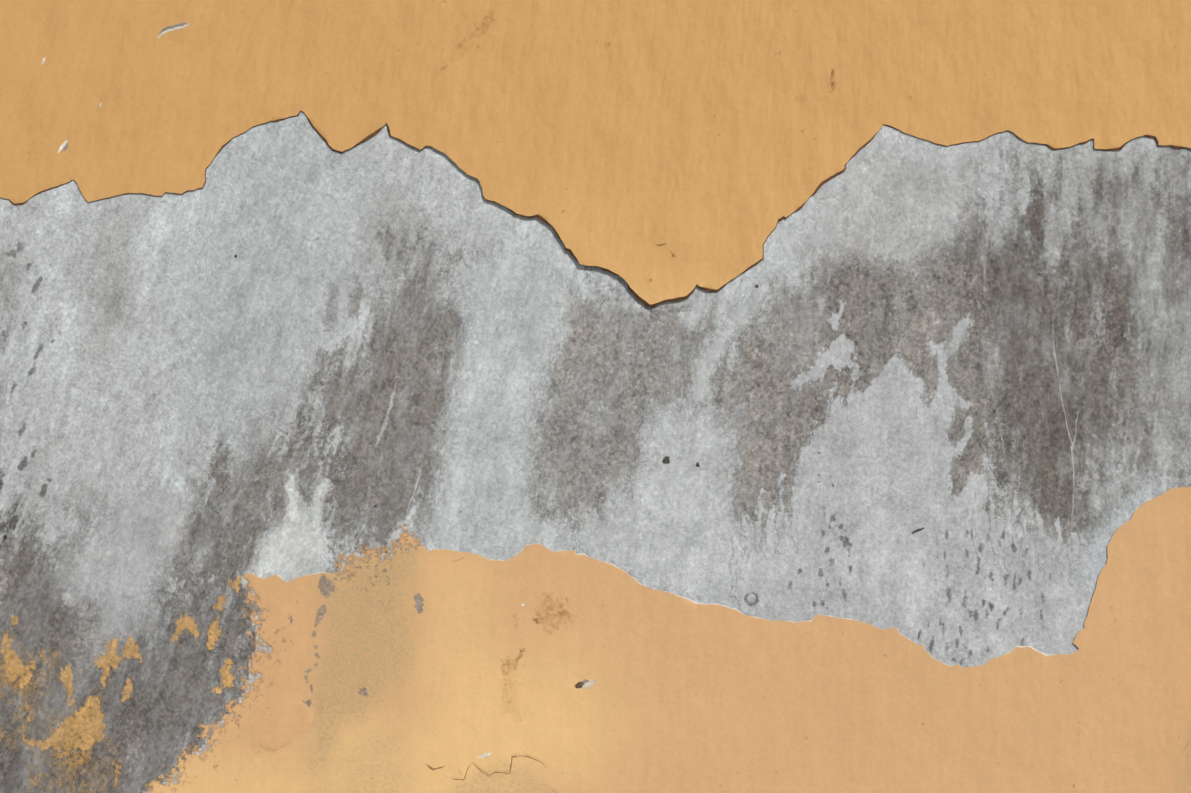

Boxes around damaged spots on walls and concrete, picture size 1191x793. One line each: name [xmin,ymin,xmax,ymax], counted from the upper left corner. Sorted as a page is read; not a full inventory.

damp [0,235,465,793]
peeling [0,111,1191,715]
damp [525,266,717,536]
damp [714,206,1157,532]
peeling [0,694,119,793]
peeling [159,657,236,785]
crack [426,746,549,780]